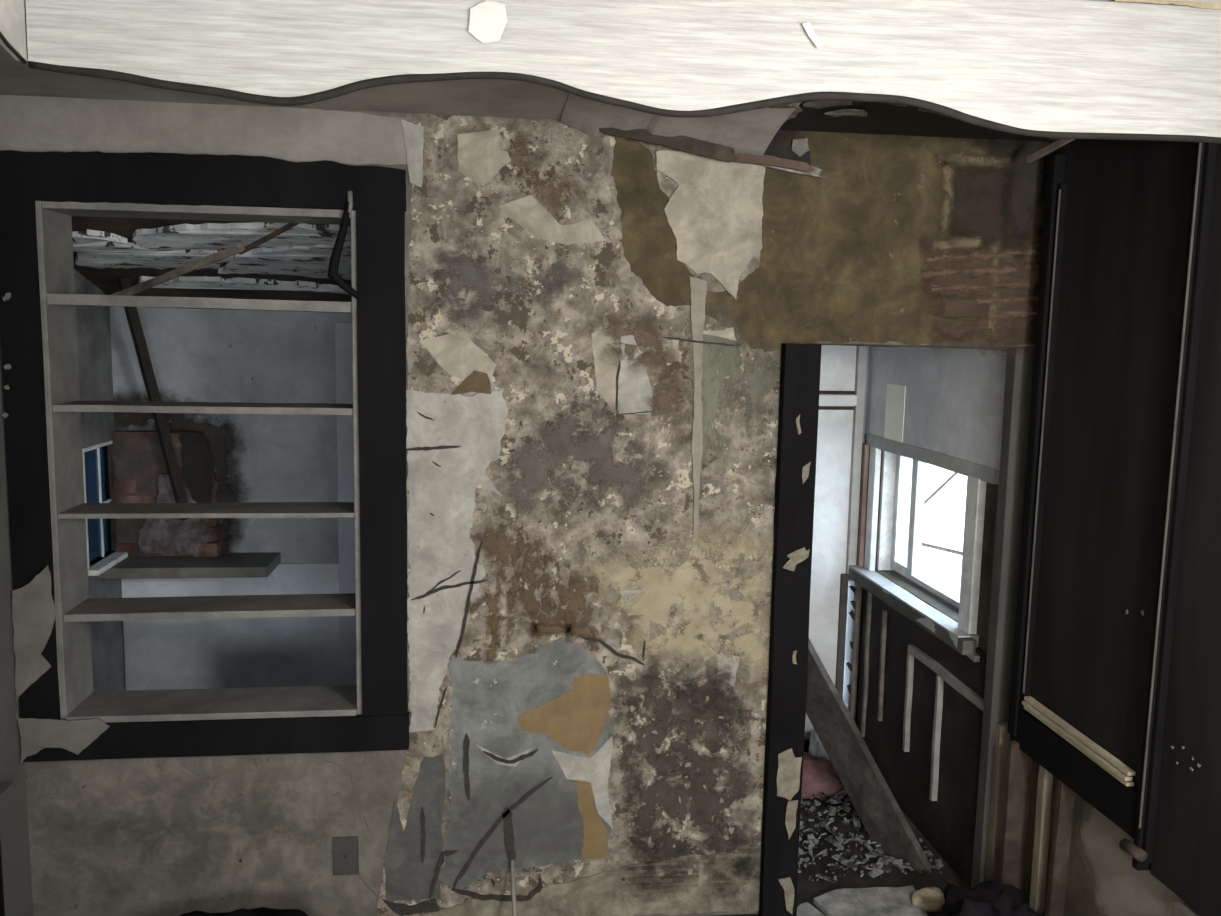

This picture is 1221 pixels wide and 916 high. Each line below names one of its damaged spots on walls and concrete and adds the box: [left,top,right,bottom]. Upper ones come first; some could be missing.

flaking render [611,131,1045,352]
water stain [509,398,650,518]
peeling [802,462,811,483]
crack [411,540,489,658]
flaking render [382,370,761,916]
peeling [782,547,810,571]
crack [435,687,447,727]
water stain [583,523,774,894]
crack [421,733,553,902]
peeling [776,748,802,840]
peeling [778,877,794,914]